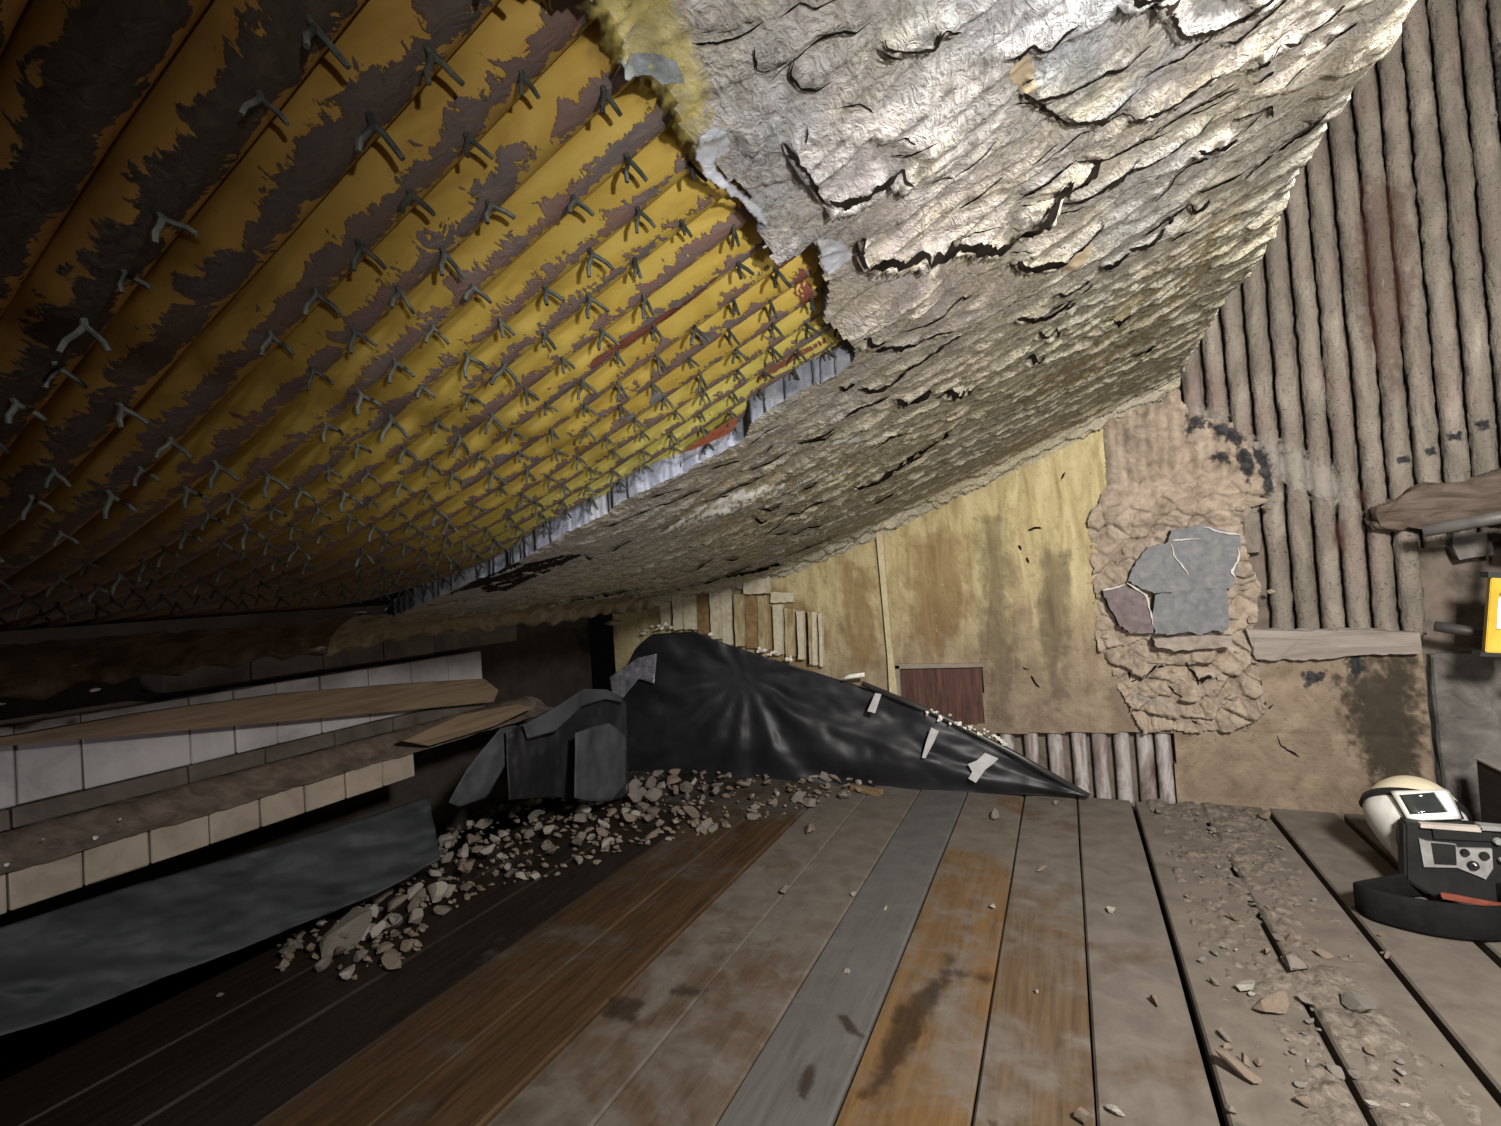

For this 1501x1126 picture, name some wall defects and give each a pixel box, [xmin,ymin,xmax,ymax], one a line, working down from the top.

spalling [615,19,684,123]
crack [692,0,962,113]
spalling [692,127,783,264]
crack [782,0,1358,366]
spalling [816,238,854,318]
spalling [383,340,857,618]
crack [546,294,981,605]
crack [1018,527,1042,563]
spalling [1088,388,1276,803]